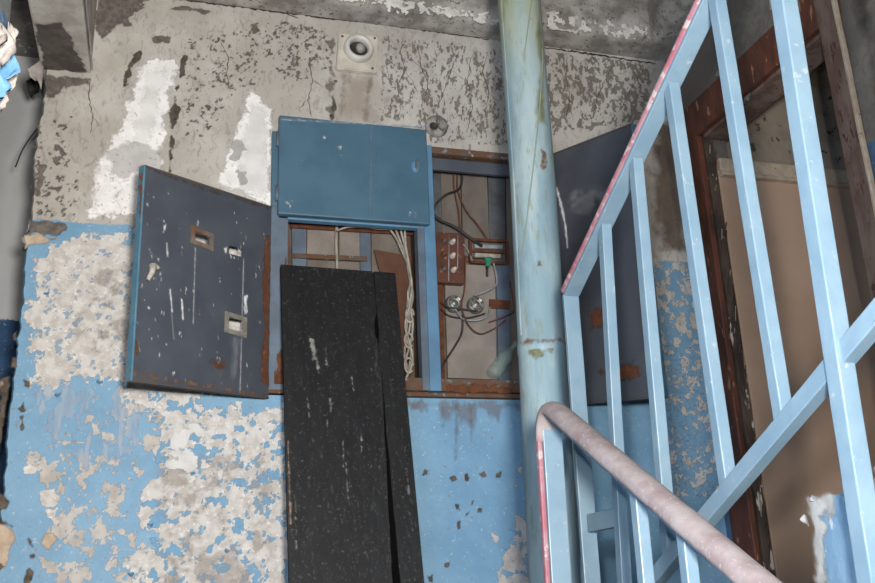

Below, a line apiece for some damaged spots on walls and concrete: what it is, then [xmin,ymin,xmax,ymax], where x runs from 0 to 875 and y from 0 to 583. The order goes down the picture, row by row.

peeling [340,0,499,25]
peeling [0,22,21,112]
peeling [0,116,288,583]
peeling [652,256,719,500]
peeling [491,514,529,583]
spalling [800,492,844,583]